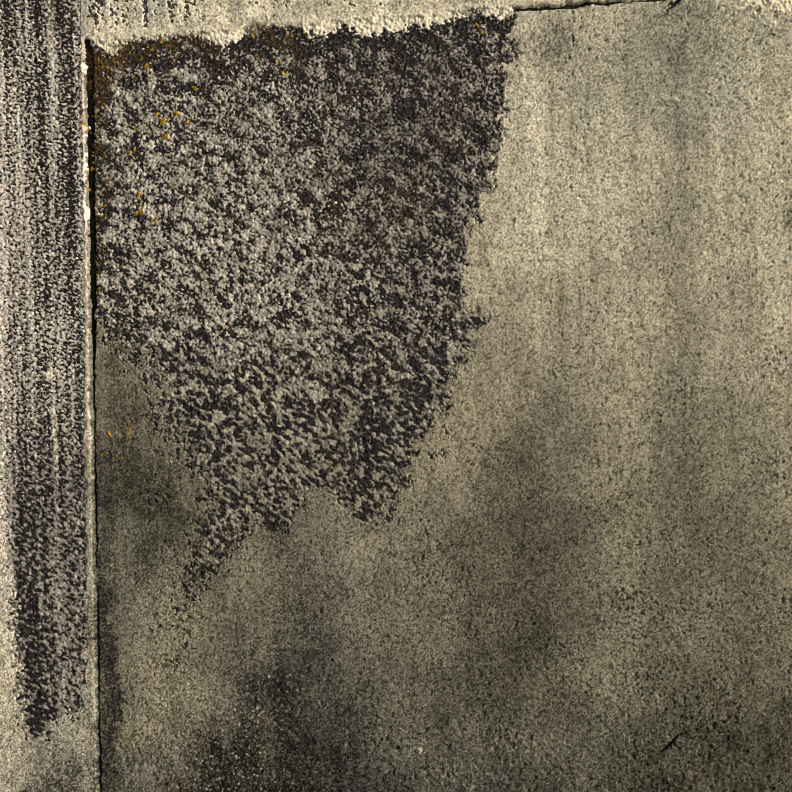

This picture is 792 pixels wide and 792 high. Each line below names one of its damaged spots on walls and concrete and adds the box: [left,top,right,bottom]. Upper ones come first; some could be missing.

crack [515,0,680,11]
peeling [0,0,522,741]
damp [96,395,185,580]
damp [23,550,124,792]
damp [170,646,367,792]